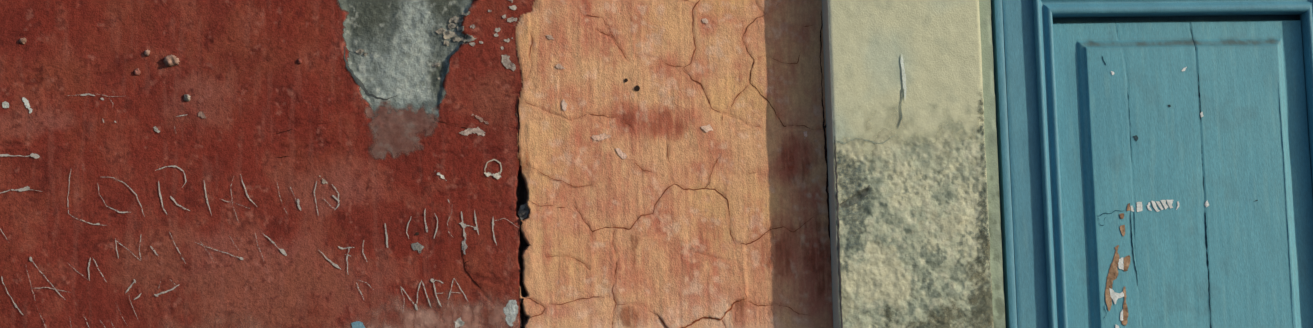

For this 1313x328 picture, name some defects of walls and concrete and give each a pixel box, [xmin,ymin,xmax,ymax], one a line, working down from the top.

spalling [338,0,517,159]
crack [461,247,490,300]
crack [516,0,903,328]
damp [837,151,871,272]
damp [906,98,994,328]
peeling [1096,200,1179,328]